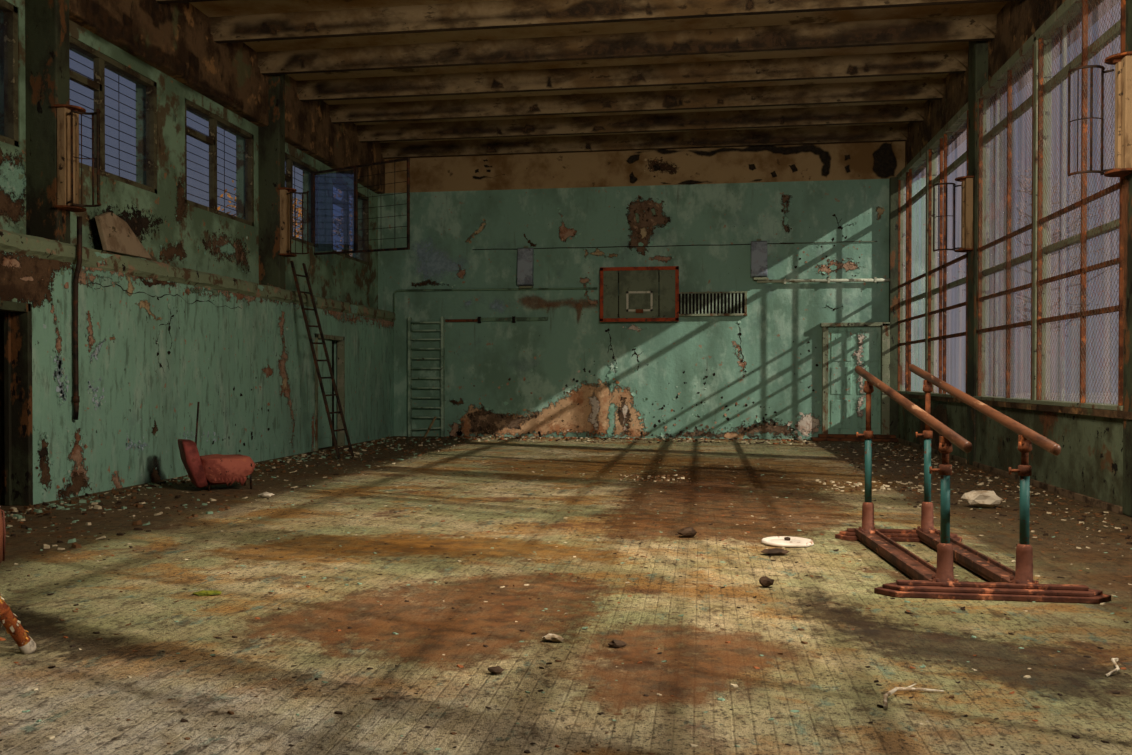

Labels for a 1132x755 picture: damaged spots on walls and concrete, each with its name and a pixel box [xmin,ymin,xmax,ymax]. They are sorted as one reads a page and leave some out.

leakage [85,0,243,110]
leakage [233,21,370,35]
leakage [500,0,661,19]
leakage [346,22,951,66]
leakage [374,104,553,179]
leakage [583,85,921,185]
spalling [0,148,26,233]
peeling [580,195,674,305]
spalling [0,172,296,452]
spalling [445,356,821,440]
peeling [730,338,749,378]
spalling [36,428,92,500]